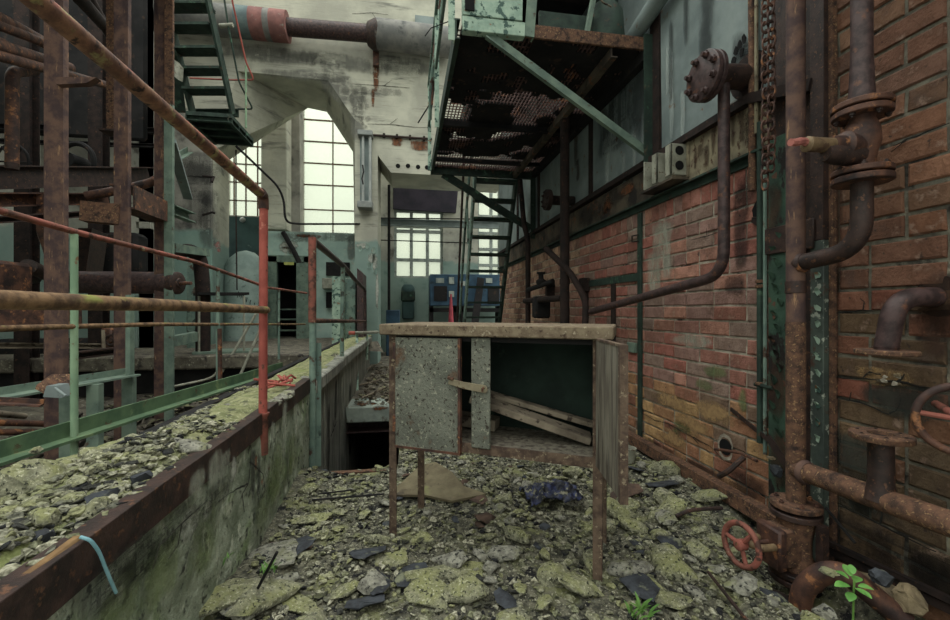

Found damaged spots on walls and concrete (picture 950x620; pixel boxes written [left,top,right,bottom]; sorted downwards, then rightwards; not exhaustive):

peeling [813,272,821,443]
water stain [864,379,942,419]
water stain [80,480,228,620]